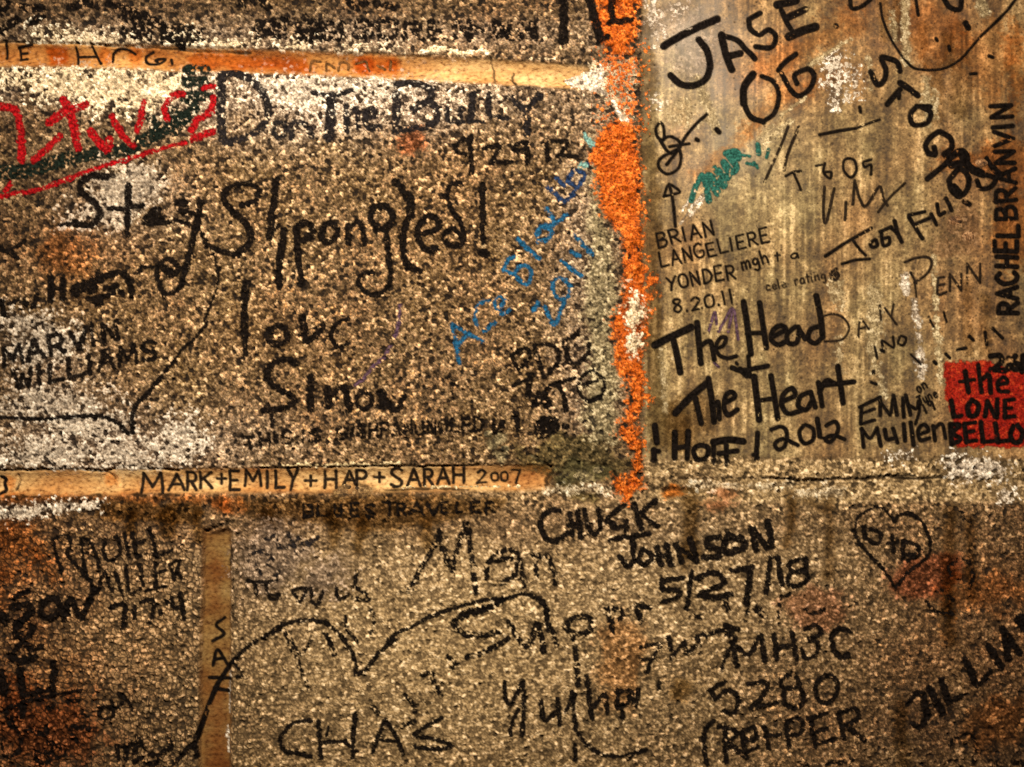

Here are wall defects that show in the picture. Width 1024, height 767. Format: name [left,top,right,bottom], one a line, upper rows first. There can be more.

crack [762,474,946,485]
water stain [542,483,612,497]
water stain [688,480,842,497]